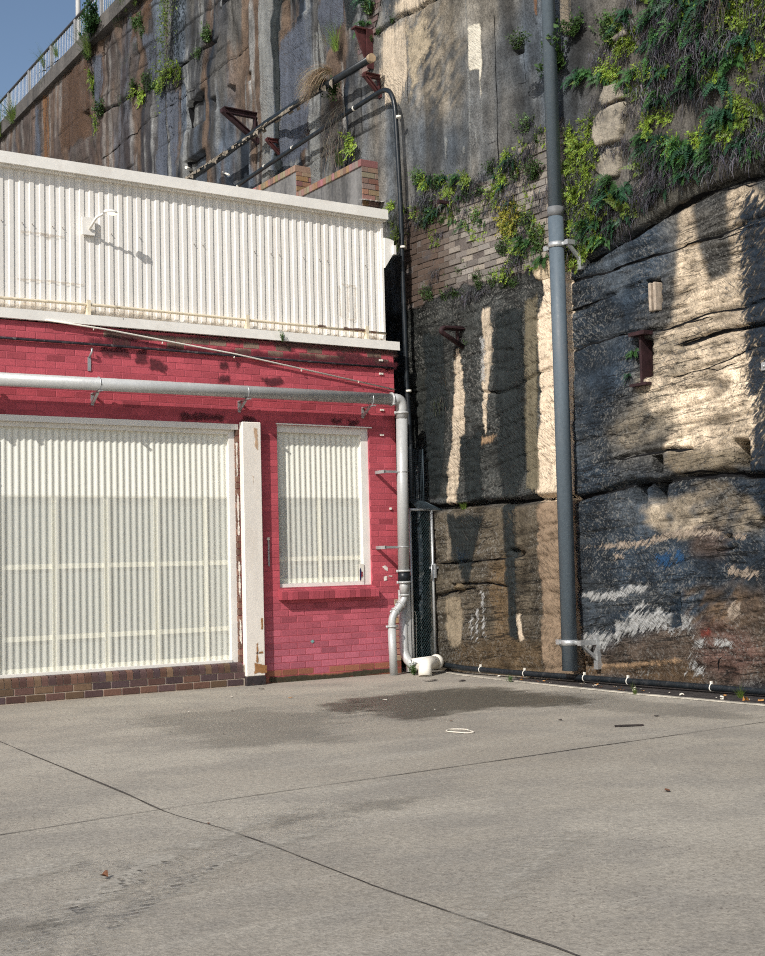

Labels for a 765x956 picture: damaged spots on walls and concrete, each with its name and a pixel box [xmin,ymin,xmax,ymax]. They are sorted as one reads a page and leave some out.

damp [92,55,104,107]
damp [142,33,181,177]
damp [325,687,583,719]